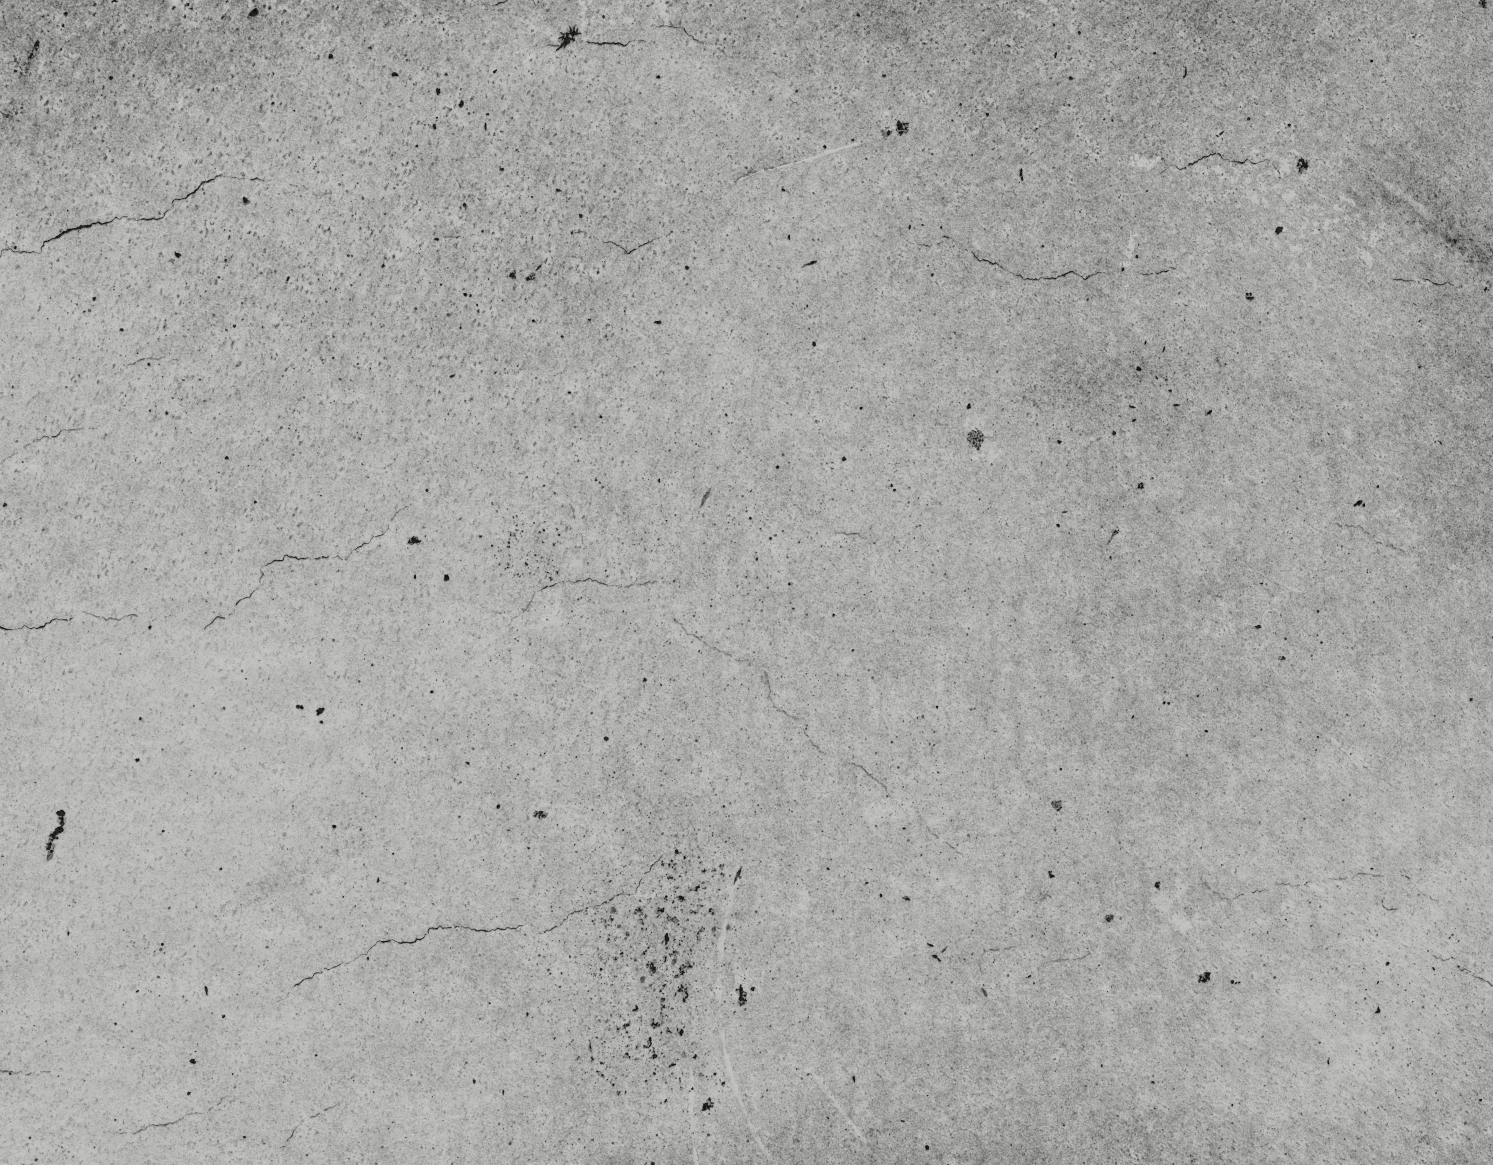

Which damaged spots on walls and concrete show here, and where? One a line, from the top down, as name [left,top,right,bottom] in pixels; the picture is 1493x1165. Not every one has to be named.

crack [1152,151,1281,178]
crack [0,174,331,257]
crack [919,236,1175,280]
crack [204,506,409,629]
crack [0,611,153,630]
crack [277,855,663,1002]